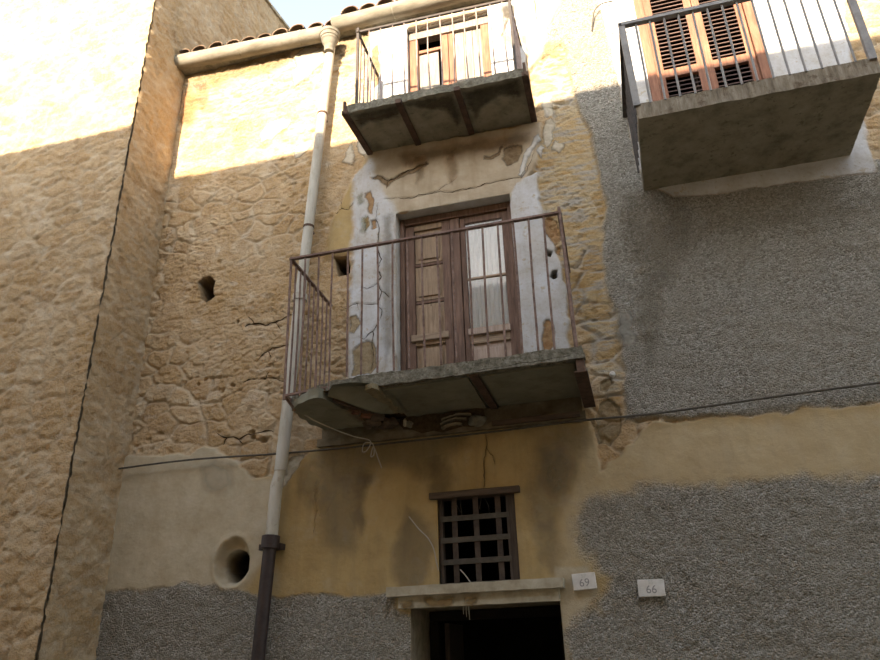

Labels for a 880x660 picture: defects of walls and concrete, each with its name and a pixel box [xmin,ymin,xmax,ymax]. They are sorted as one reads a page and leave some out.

damp [356,96,460,125]
damp [466,80,520,116]
crack [342,153,534,368]
crack [244,314,292,382]
spalling [323,341,487,433]